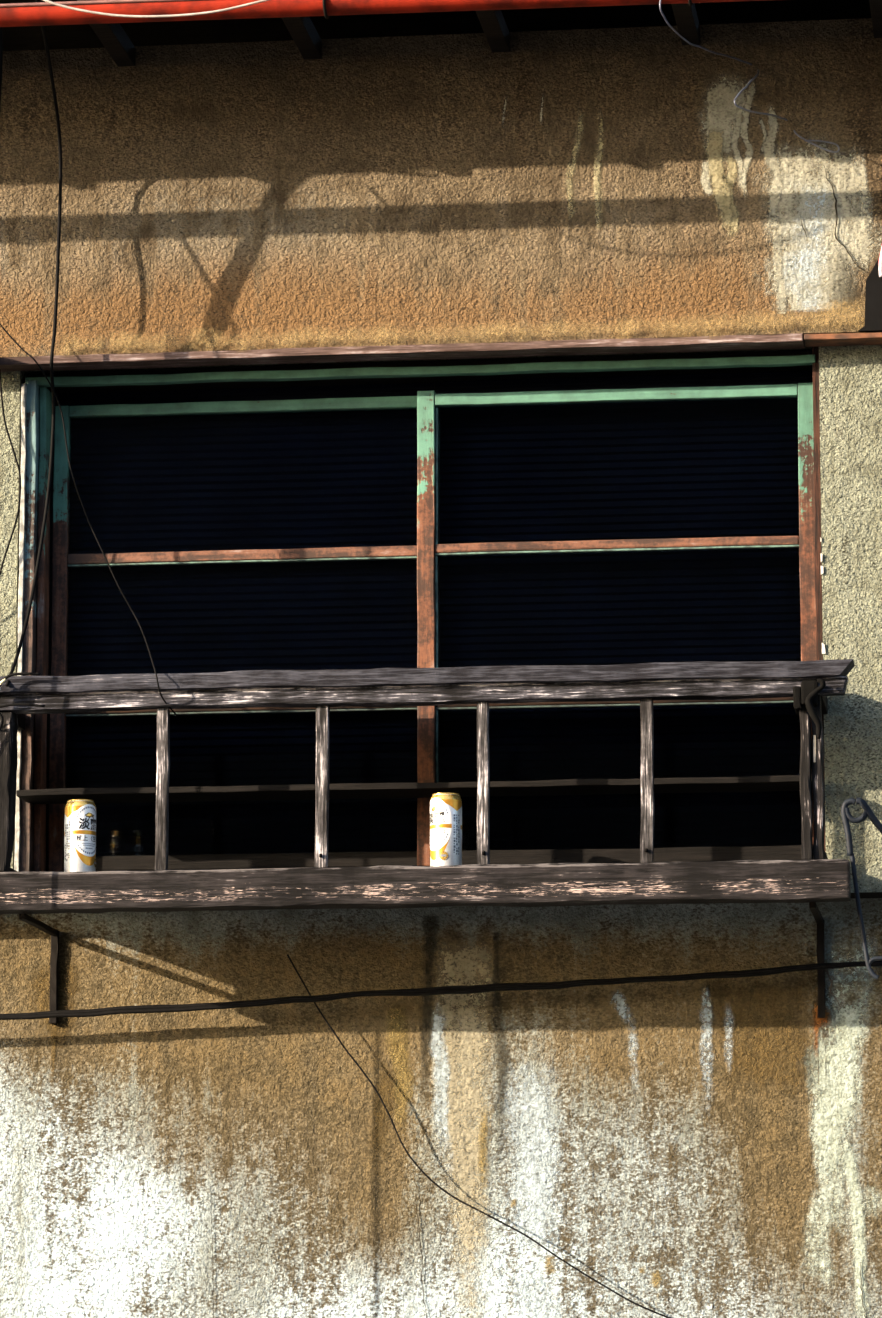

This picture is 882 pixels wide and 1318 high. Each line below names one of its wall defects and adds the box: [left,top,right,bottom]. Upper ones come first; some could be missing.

damp [566,115,604,226]
damp [700,75,881,314]
crack [800,166,868,275]
damp [613,992,635,1054]
damp [701,991,732,1080]
damp [420,916,561,1318]
damp [804,943,882,1318]